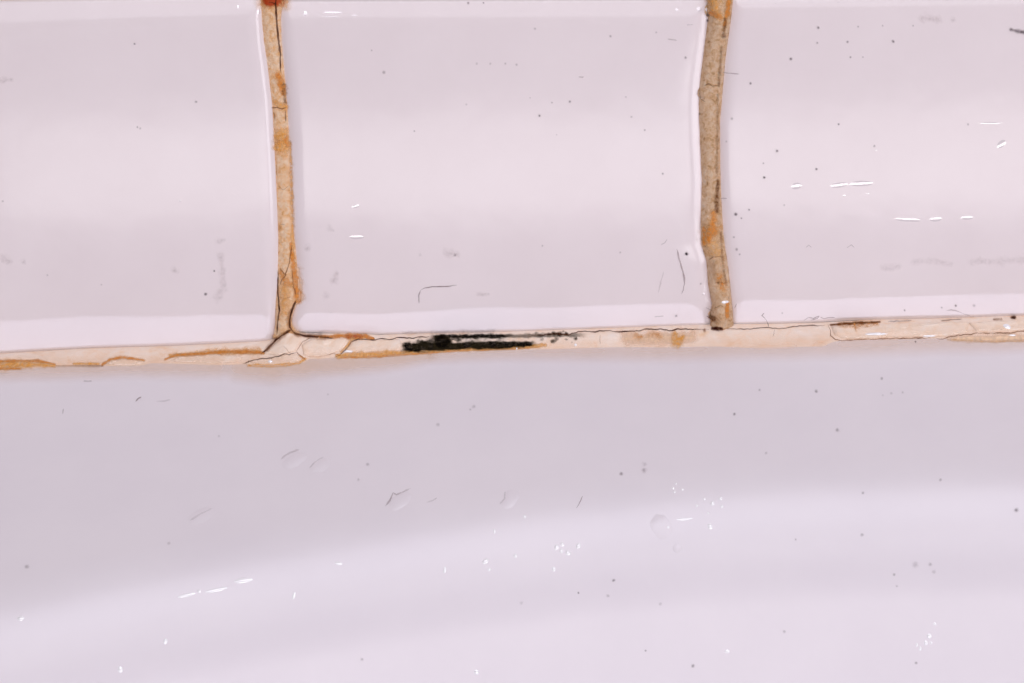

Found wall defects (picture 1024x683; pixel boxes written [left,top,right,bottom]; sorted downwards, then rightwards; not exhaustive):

corrosion [273,72,288,111]
corrosion [274,128,304,315]
corrosion [702,211,721,256]
crack [244,247,424,364]
corrosion [709,274,729,321]
corrosion [0,359,56,370]
corrosion [73,356,145,366]
corrosion [165,348,306,367]
damp [402,332,577,352]
crack [541,316,1020,341]